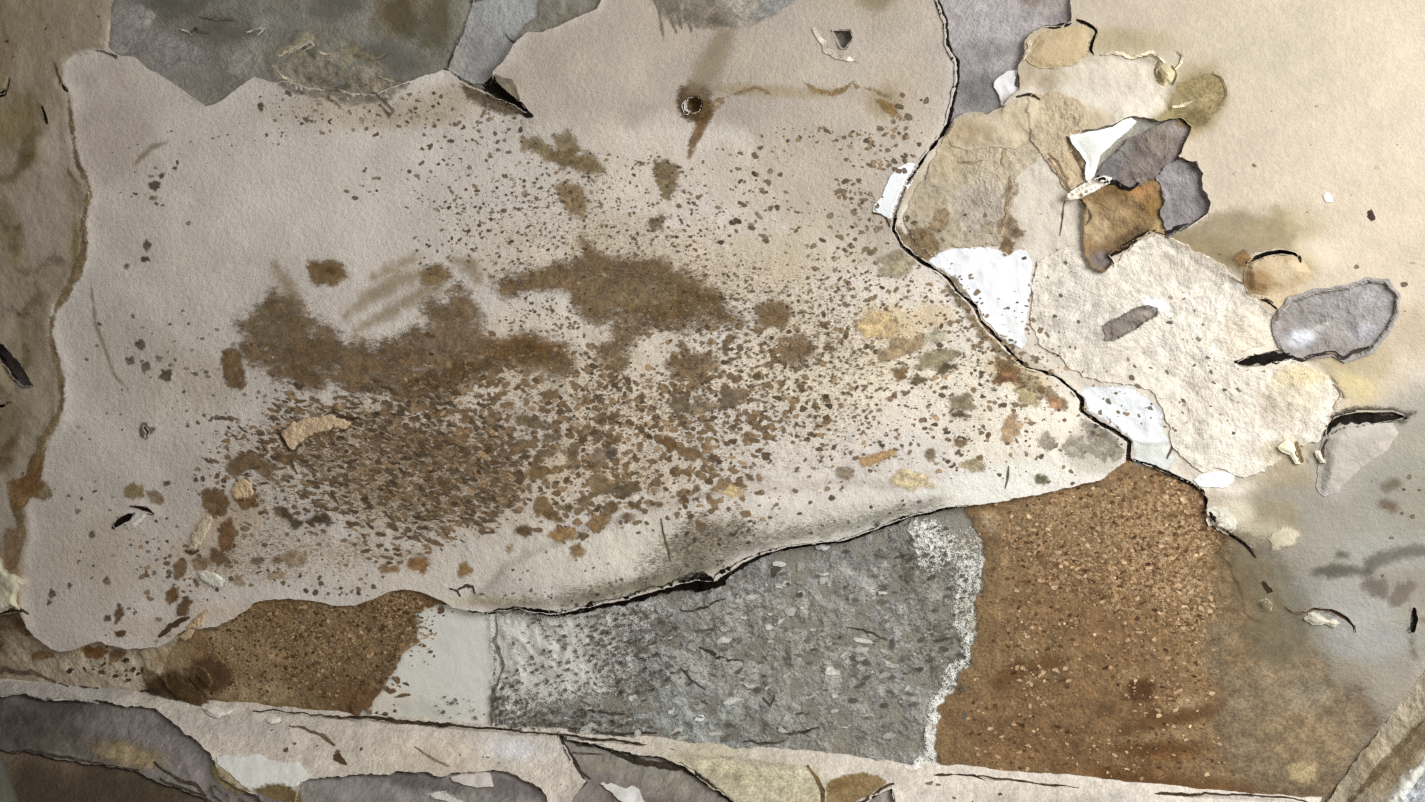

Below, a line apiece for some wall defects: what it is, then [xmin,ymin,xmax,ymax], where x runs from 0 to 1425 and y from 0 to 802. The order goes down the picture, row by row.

peeling [109,0,601,118]
peeling [652,0,793,36]
peeling [873,0,1408,488]
crack [872,0,1356,632]
damp [0,78,1241,770]
flaking render [185,515,213,555]
crack [449,505,969,617]
peeling [1205,507,1237,535]
peeling [1268,527,1299,551]
peeling [0,557,547,802]
spalling [360,517,971,802]